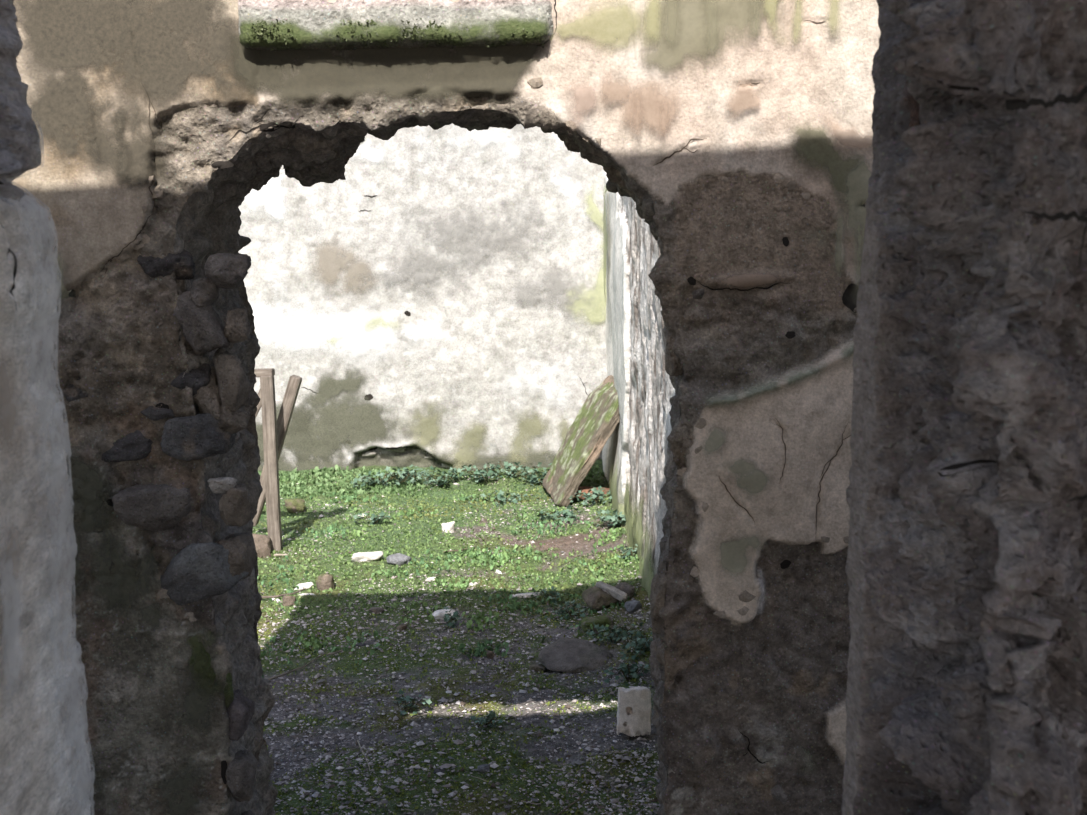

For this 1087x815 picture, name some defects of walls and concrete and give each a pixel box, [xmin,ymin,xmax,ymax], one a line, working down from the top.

crack [1005,85,1087,111]
leakage [246,177,285,219]
crack [1,224,17,295]
crack [1021,210,1087,269]
leakage [250,297,444,357]
leakage [511,363,568,404]
leakage [256,423,264,471]
spalling [54,77,601,815]
leakage [276,371,556,471]
spalling [618,172,858,815]
crack [776,419,786,484]
crack [815,425,851,539]